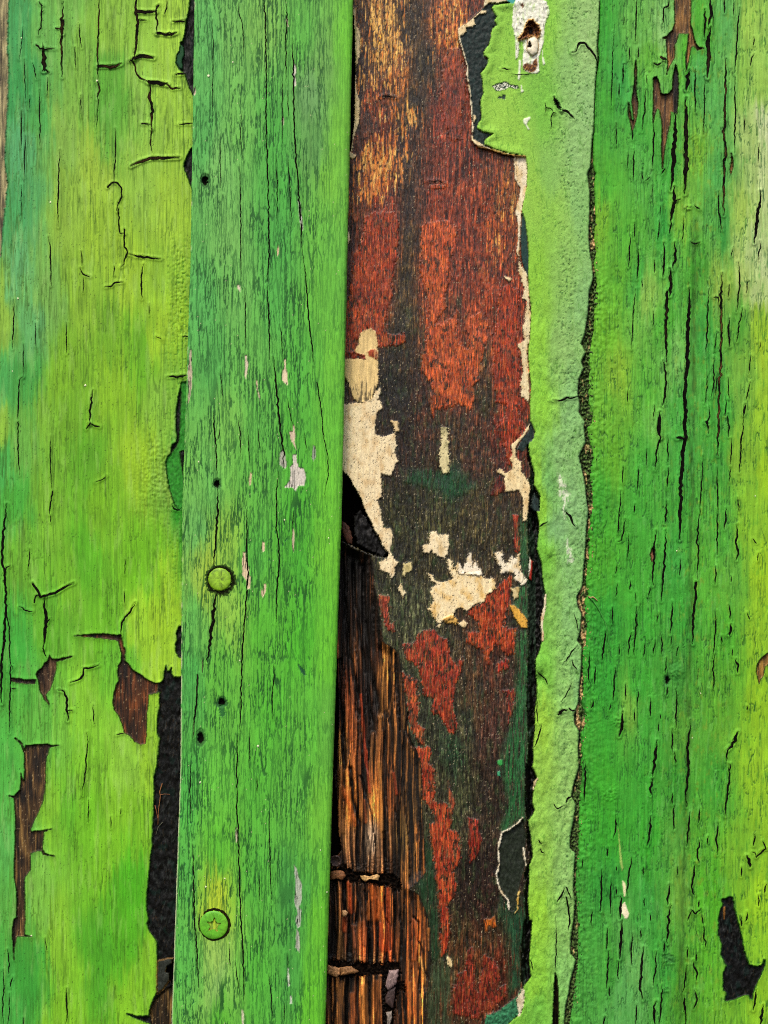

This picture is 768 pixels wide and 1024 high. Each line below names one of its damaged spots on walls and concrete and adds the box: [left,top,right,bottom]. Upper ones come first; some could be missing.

crack [19,0,187,297]
peeling [458,0,526,158]
peeling [628,60,639,131]
peeling [652,0,704,170]
peeling [345,329,379,403]
peeling [517,423,535,452]
crack [530,0,761,1024]
peeling [11,655,73,706]
peeling [9,738,60,961]
peeling [74,633,181,1024]
peeling [718,896,767,1003]
crack [740,836,767,926]